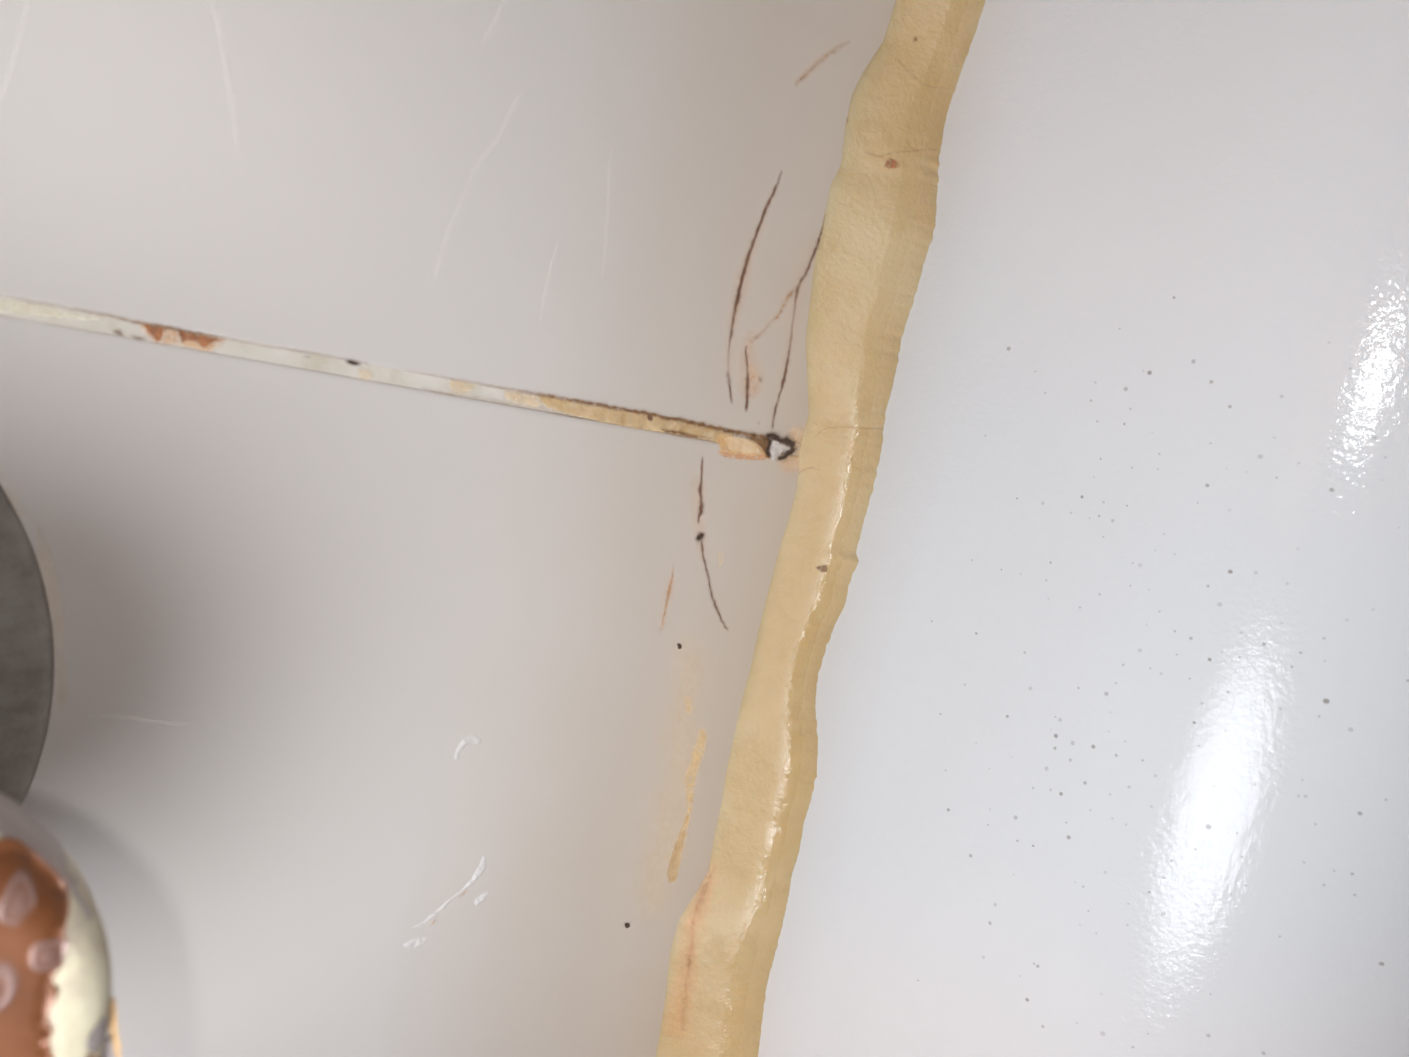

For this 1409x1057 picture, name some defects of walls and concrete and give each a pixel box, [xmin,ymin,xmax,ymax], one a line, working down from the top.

crack [780,228,823,313]
crack [109,315,206,336]
corrosion [113,325,218,350]
crack [520,186,790,628]
peeling [86,996,121,1057]